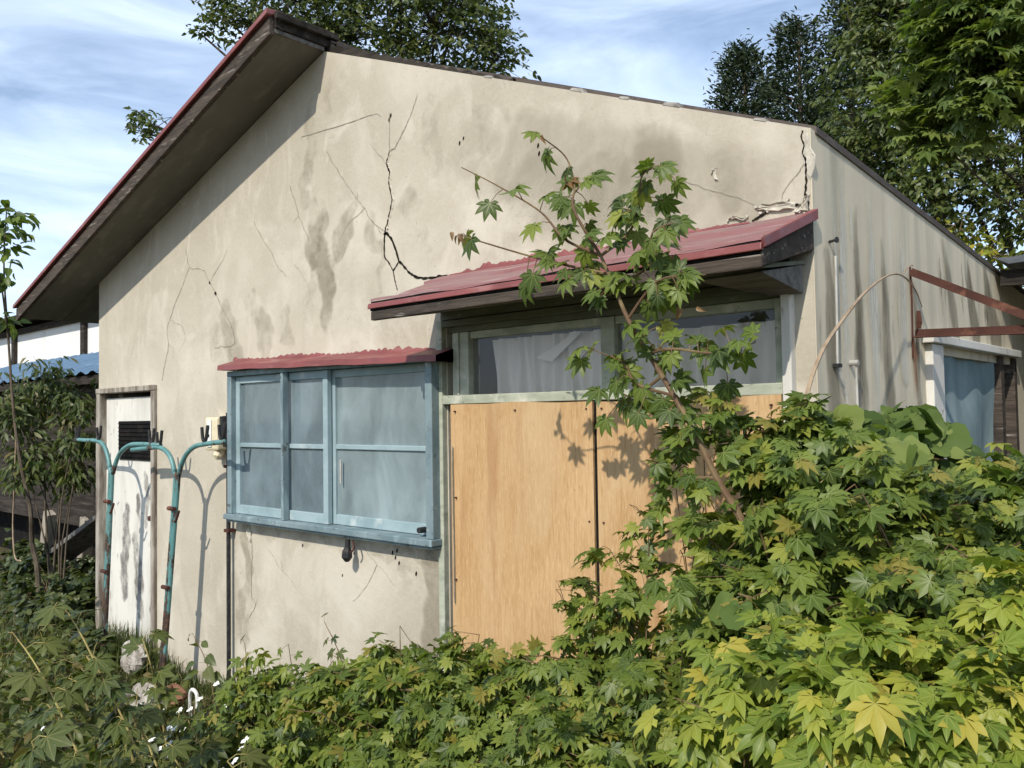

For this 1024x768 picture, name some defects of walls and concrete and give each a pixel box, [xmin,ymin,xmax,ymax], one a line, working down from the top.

crack [301,96,448,289]
crack [635,130,810,222]
spalling [726,195,810,221]
crack [162,253,235,378]
damp [834,221,894,407]
damp [967,277,1001,356]
damp [121,483,149,618]